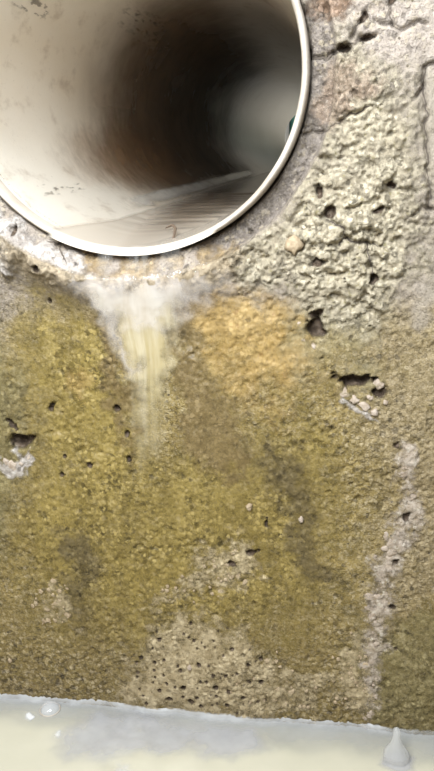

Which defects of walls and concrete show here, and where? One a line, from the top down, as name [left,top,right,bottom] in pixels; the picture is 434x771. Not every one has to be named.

crack [311,5,425,61]
crack [306,105,371,135]
crack [414,62,434,215]
damp [92,314,138,425]
damp [165,323,333,580]
spalling [333,374,388,422]
damp [360,442,425,721]